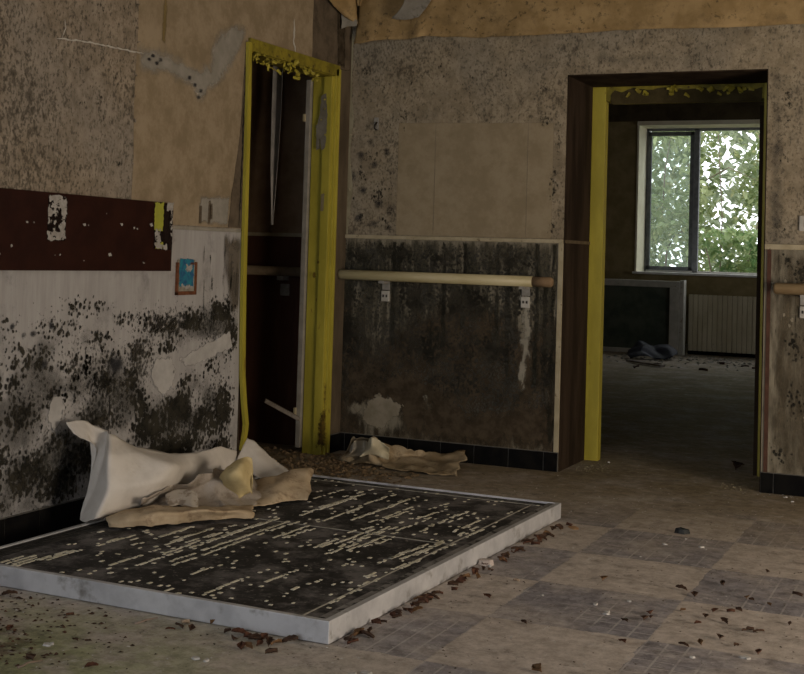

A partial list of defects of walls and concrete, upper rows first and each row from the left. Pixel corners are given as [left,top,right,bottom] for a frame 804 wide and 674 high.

water stain [0,238,241,515]
spalling [354,393,404,429]
water stain [340,239,557,452]
water stain [771,294,804,473]
water stain [776,254,804,284]